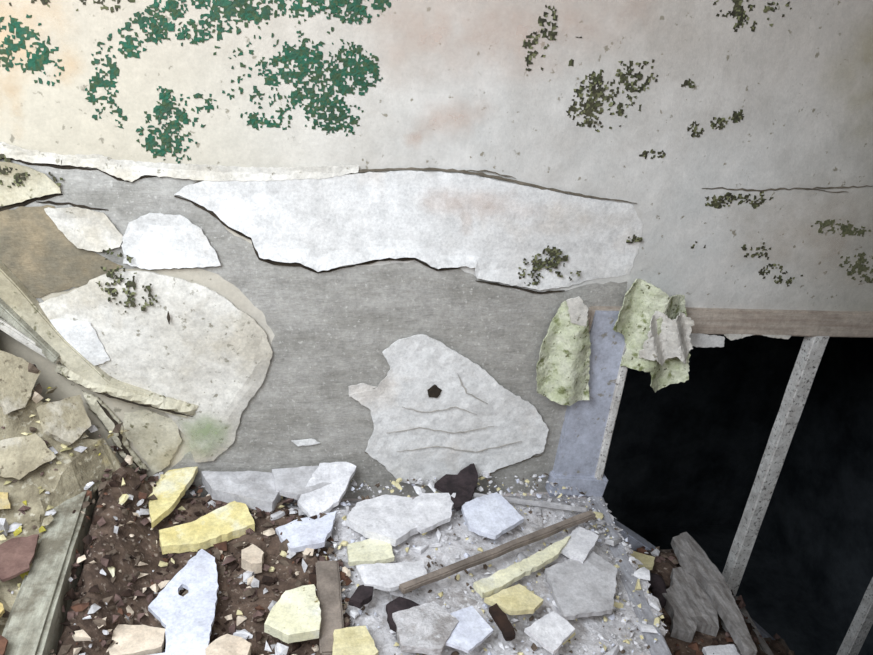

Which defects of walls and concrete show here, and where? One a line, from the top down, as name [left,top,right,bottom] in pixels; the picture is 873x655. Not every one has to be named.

crack [702,185,873,193]
flaking render [0,0,792,499]
spalling [270,510,298,520]
spalling [575,511,631,548]